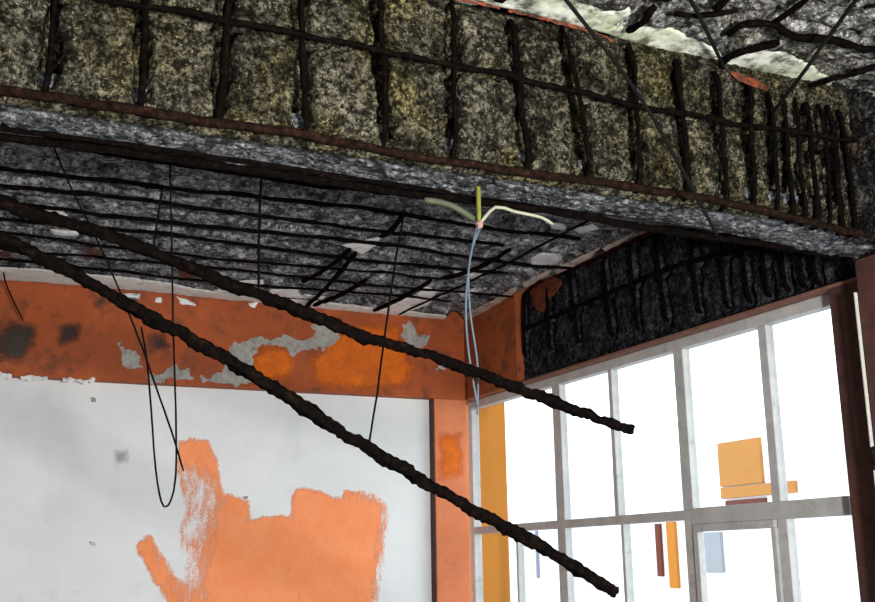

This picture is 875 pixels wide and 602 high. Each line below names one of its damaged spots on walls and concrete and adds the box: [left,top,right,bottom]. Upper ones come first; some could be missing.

spalling [0,0,875,381]
leakage [0,324,35,362]
leakage [60,325,79,344]
spalling [62,377,95,385]
peeling [118,341,251,387]